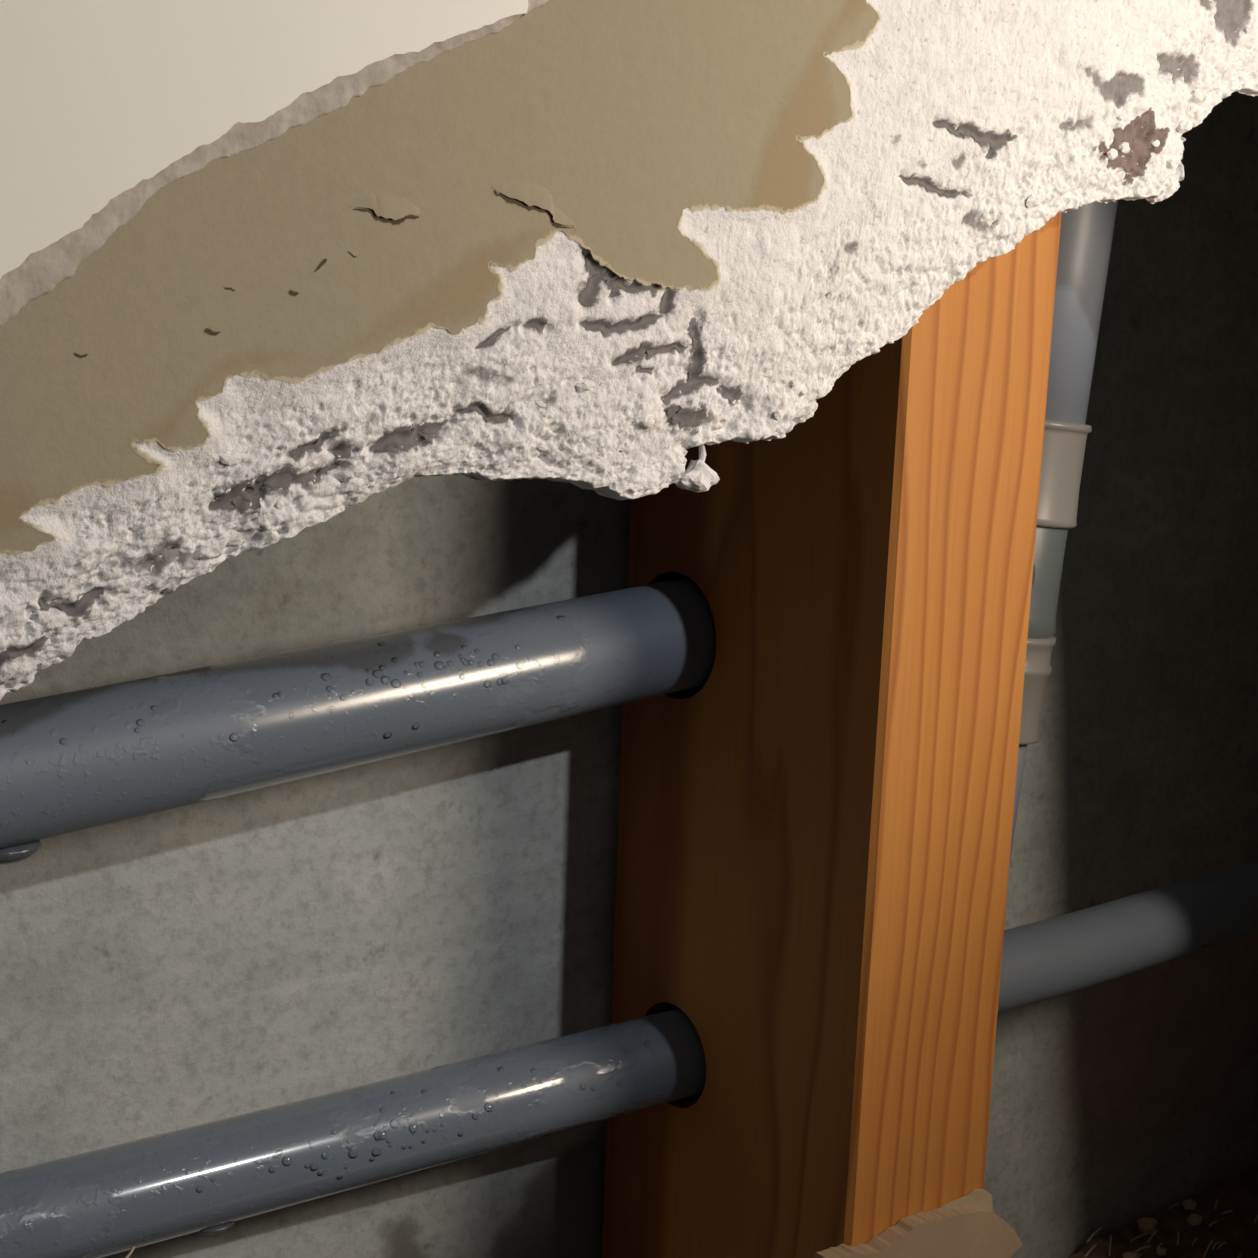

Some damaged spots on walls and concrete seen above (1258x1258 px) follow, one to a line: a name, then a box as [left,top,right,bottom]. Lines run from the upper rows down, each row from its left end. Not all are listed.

spalling [0,0,1258,700]
leakage [1095,108,1170,185]